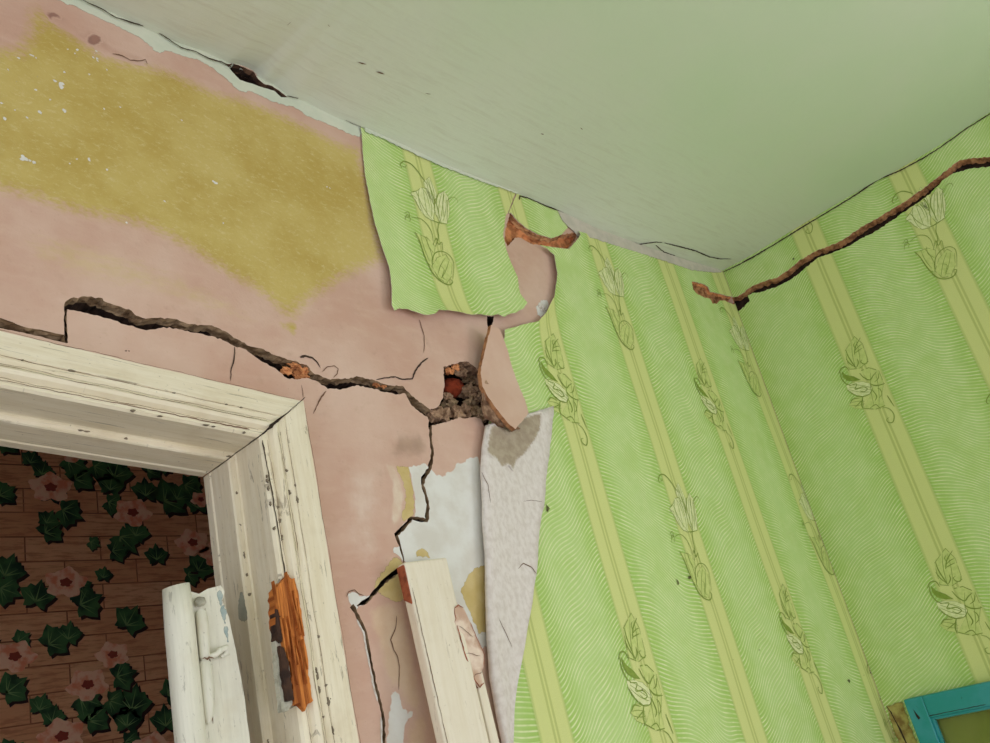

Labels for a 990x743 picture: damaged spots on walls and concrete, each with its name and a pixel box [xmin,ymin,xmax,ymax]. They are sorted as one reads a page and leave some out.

crack [637,114,990,311]
crack [0,296,460,743]
peeling [348,456,487,743]
peeling [424,325,529,432]
crack [486,316,494,327]
damp [485,412,543,471]